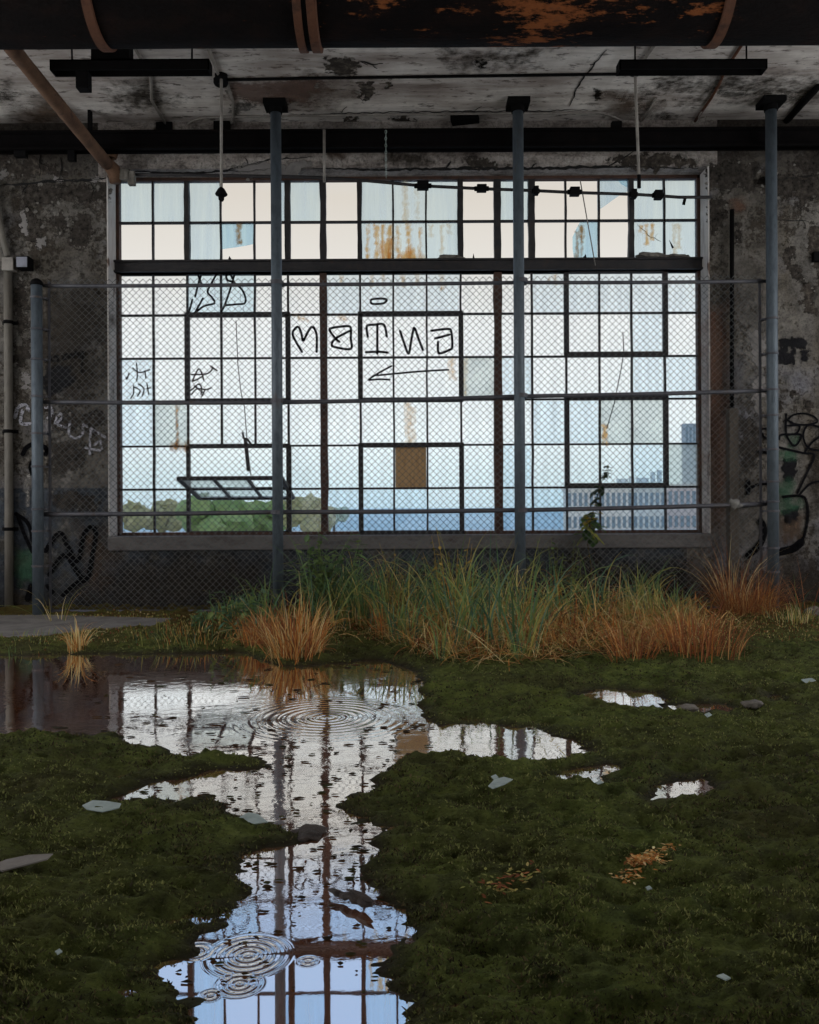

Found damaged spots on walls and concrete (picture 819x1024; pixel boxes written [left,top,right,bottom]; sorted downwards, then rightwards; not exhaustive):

crack [300,51,605,115]
water stain [441,48,540,74]
peeling [18,175,113,251]
corrosion [365,181,450,259]
peeling [606,151,819,317]